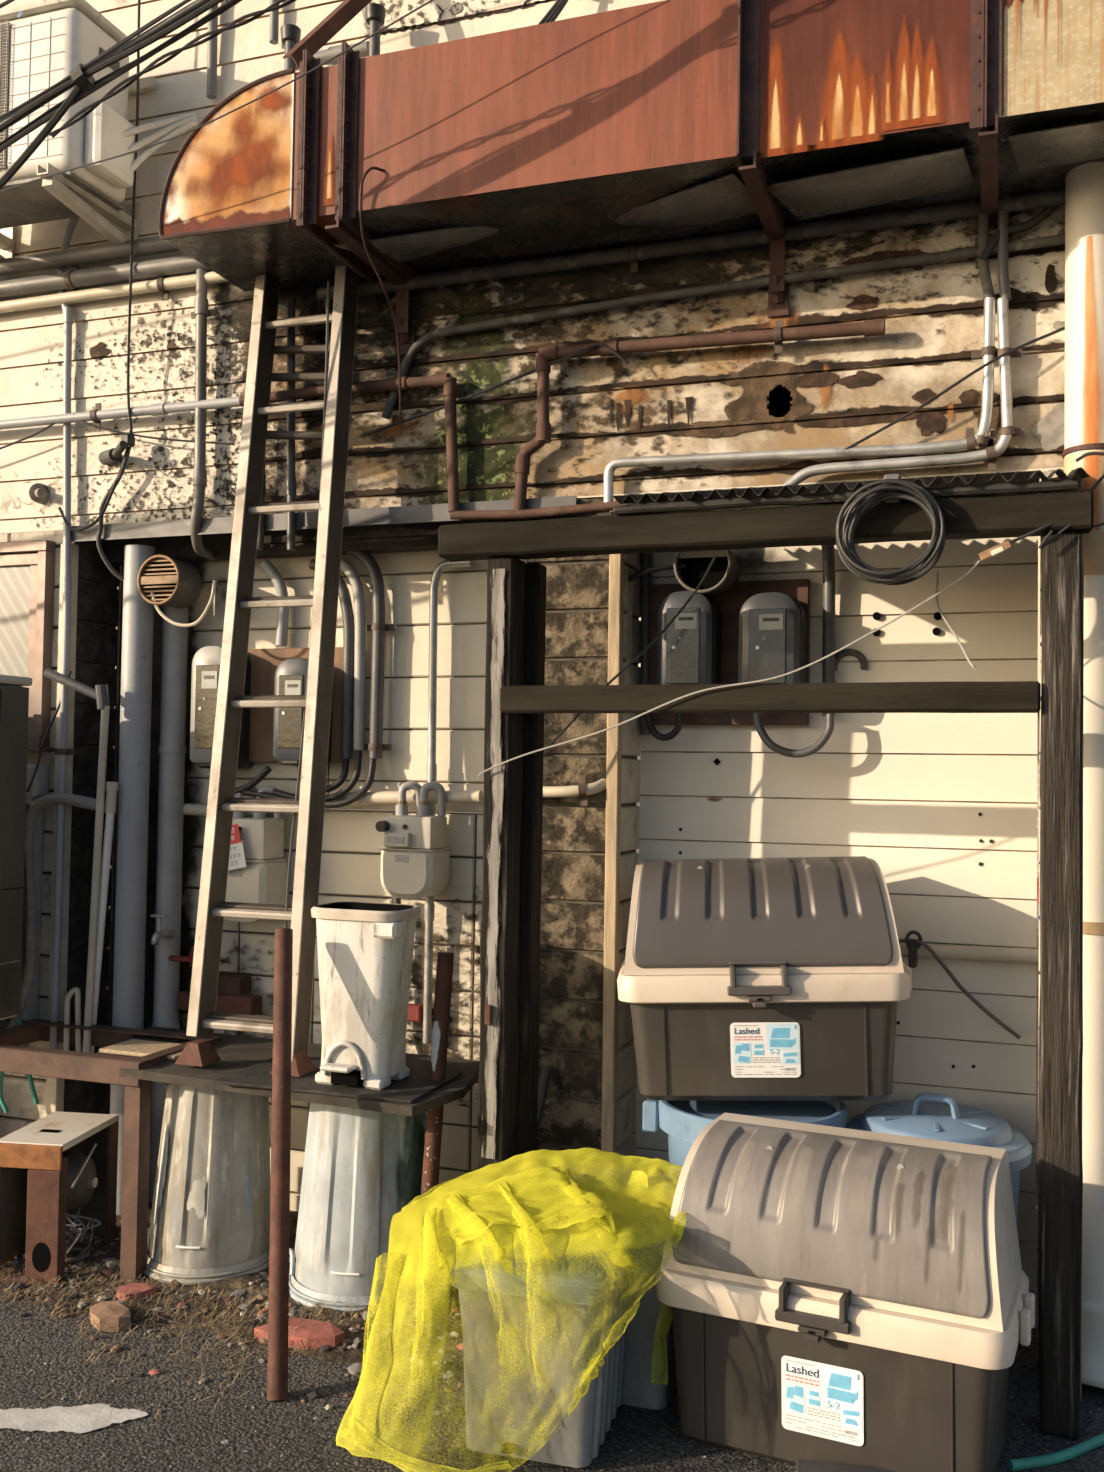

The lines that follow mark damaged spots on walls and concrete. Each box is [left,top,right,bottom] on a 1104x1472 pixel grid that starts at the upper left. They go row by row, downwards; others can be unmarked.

rust [162,75,291,235]
rust [323,135,334,206]
rust [761,0,970,158]
peeling [90,342,110,360]
damp [34,270,254,529]
damp [264,281,335,514]
damp [344,210,1065,509]
spalling [669,360,946,438]
spalling [845,294,879,310]
spalling [959,389,1001,430]
peeling [1031,403,1065,451]
rust [1083,235,1100,531]